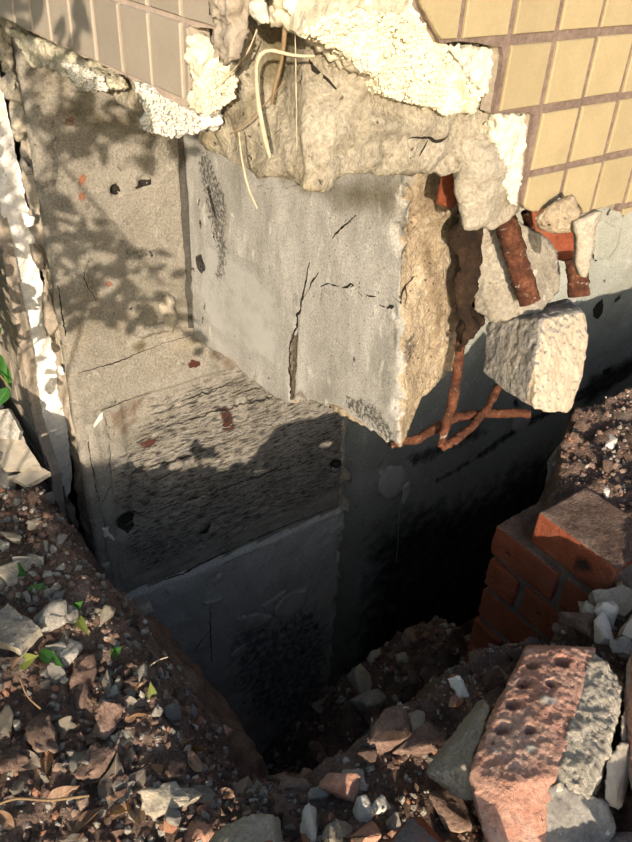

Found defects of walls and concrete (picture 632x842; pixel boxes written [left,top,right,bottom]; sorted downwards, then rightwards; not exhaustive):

peeling [192,255,206,273]
peeling [198,153,227,279]
crack [288,262,415,400]
rust [496,209,541,307]
rust [565,258,590,298]
rust [389,336,531,451]
peeling [102,371,395,570]